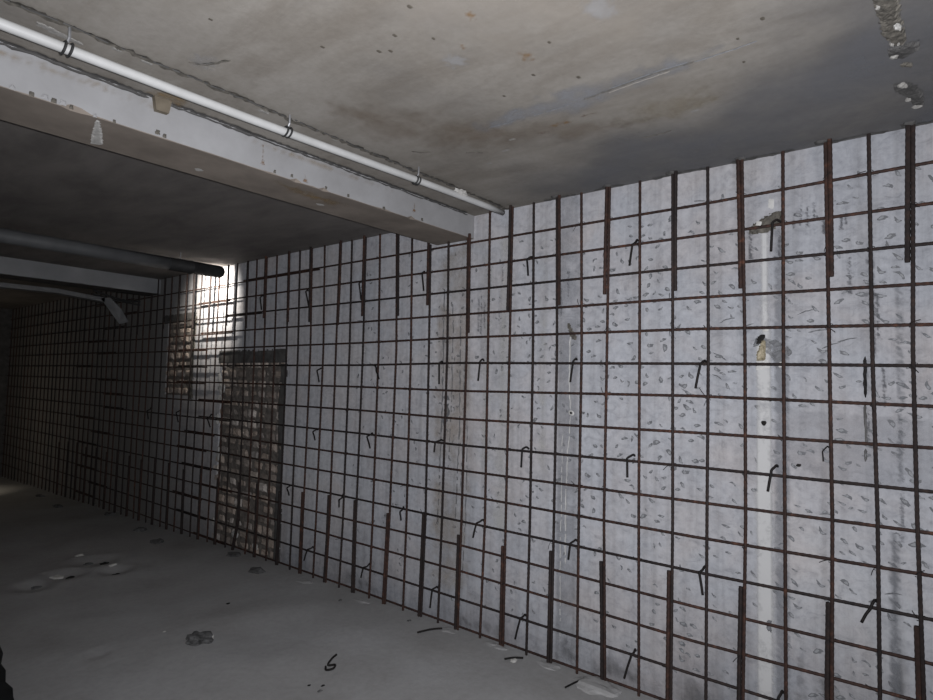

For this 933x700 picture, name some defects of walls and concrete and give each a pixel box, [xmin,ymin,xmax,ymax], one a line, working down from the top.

spalling [872,0,920,68]
spalling [893,81,924,109]